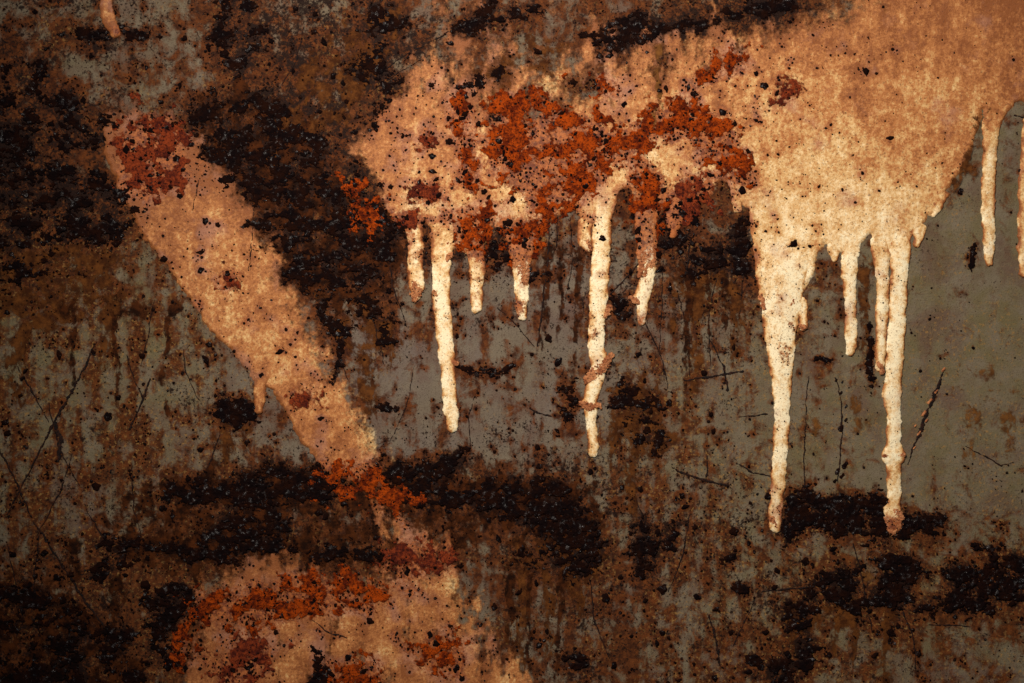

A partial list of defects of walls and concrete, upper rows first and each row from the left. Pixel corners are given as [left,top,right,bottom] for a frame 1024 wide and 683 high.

corrosion [0,0,819,683]
corrosion [697,472,1024,683]